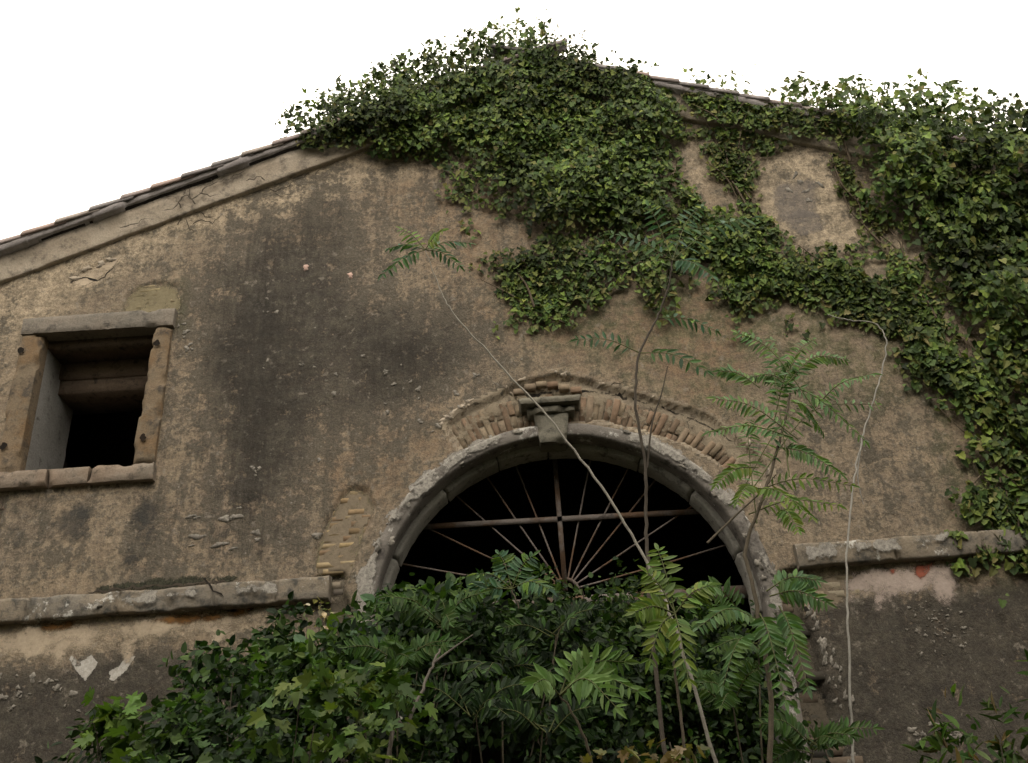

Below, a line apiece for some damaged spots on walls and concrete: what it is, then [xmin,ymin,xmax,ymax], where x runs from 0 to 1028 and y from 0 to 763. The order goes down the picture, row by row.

crack [120,159,319,231]
flaking render [218,506,244,523]
flaking render [311,370,864,763]
flaking render [70,655,98,681]
flaking render [109,656,135,681]
flaking render [0,672,81,712]